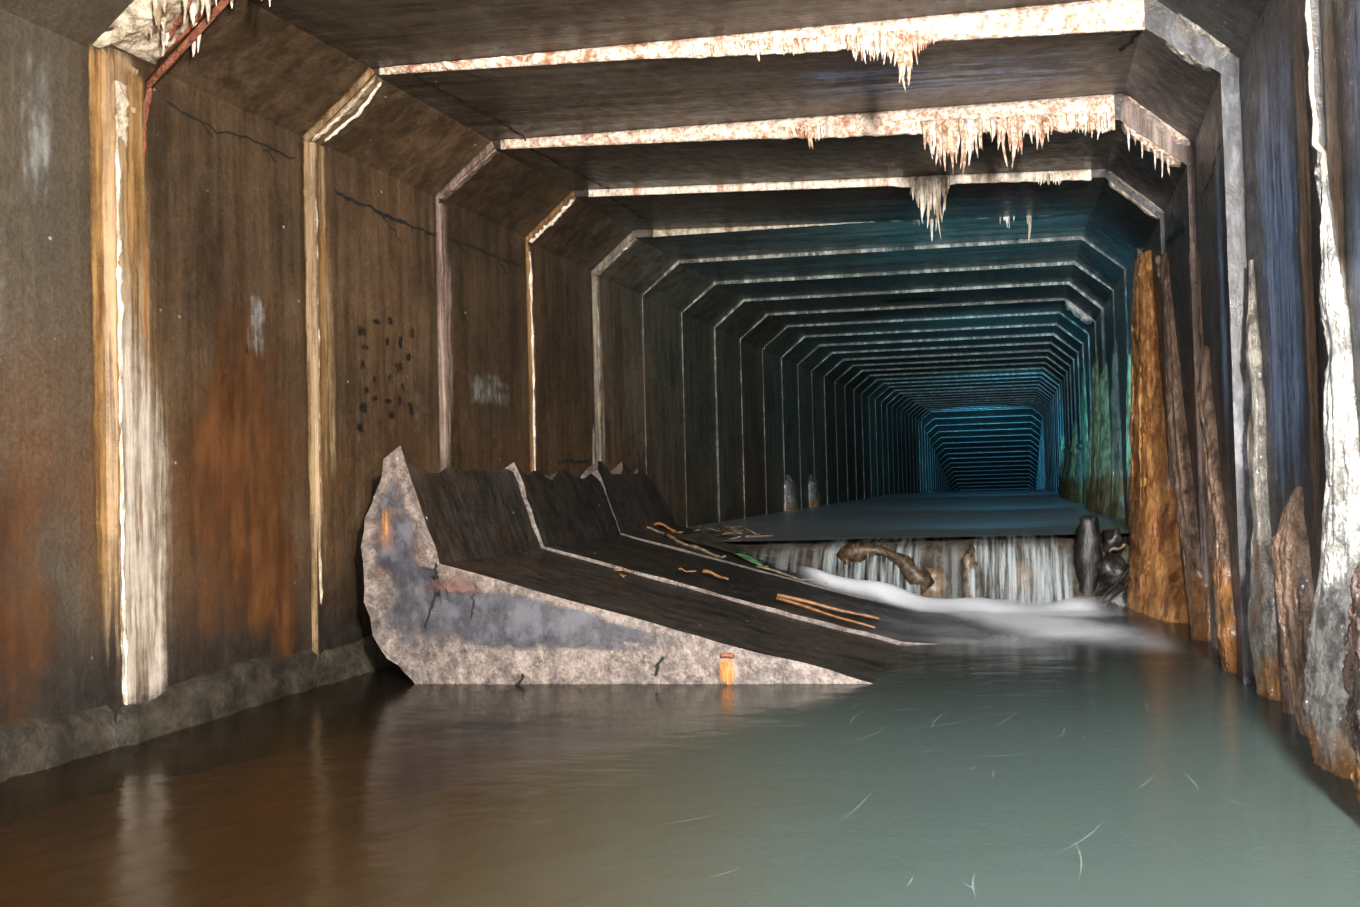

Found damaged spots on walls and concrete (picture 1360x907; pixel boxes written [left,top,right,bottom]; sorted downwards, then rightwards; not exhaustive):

crack [166,101,295,163]
crack [334,188,521,274]
leakage [1121,95,1196,282]
leakage [89,0,234,705]